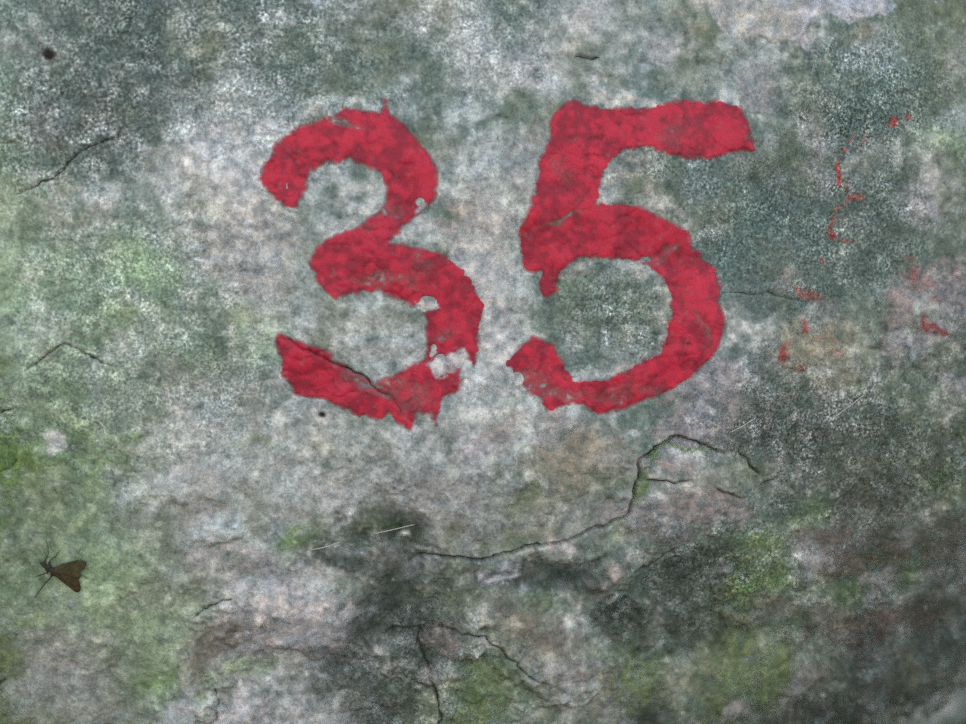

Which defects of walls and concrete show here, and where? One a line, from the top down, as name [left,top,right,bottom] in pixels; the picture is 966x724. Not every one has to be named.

spalling [767,300,837,370]
spalling [880,258,966,365]
crack [411,435,785,559]